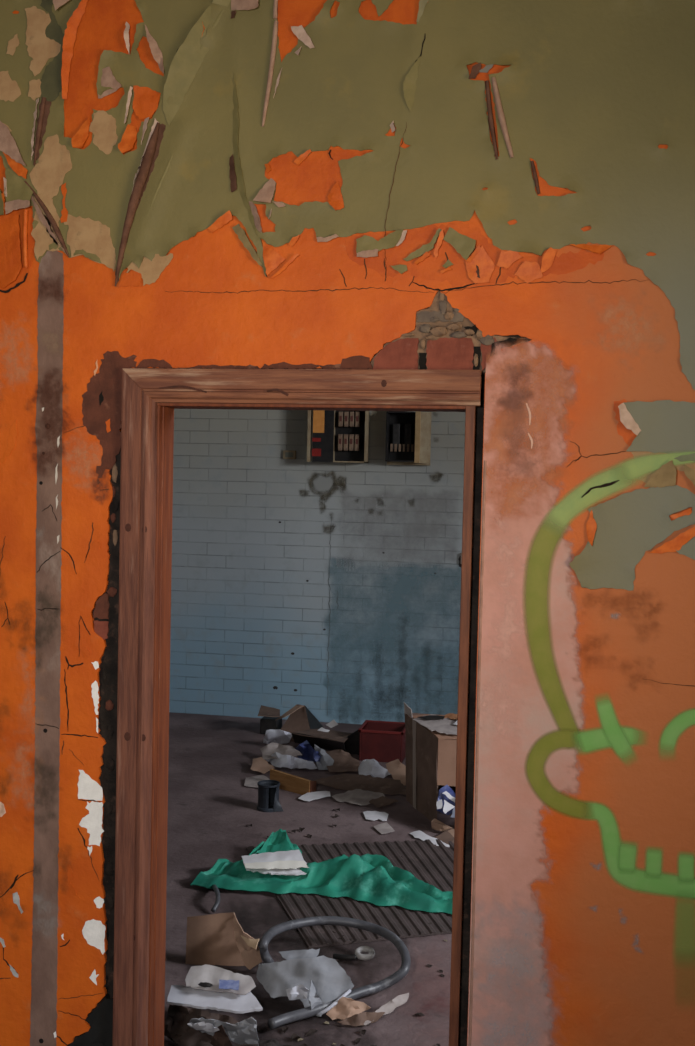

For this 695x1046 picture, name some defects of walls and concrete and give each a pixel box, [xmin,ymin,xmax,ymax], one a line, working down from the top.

peeling [0,0,173,293]
peeling [262,0,340,127]
peeling [253,146,372,278]
peeling [359,0,429,24]
crack [166,35,646,294]
peeling [467,62,514,159]
crack [37,523,94,574]
damp [300,472,346,509]
crack [567,441,626,467]
crack [581,480,620,498]
crack [35,608,98,765]
flaking render [68,222,614,1046]